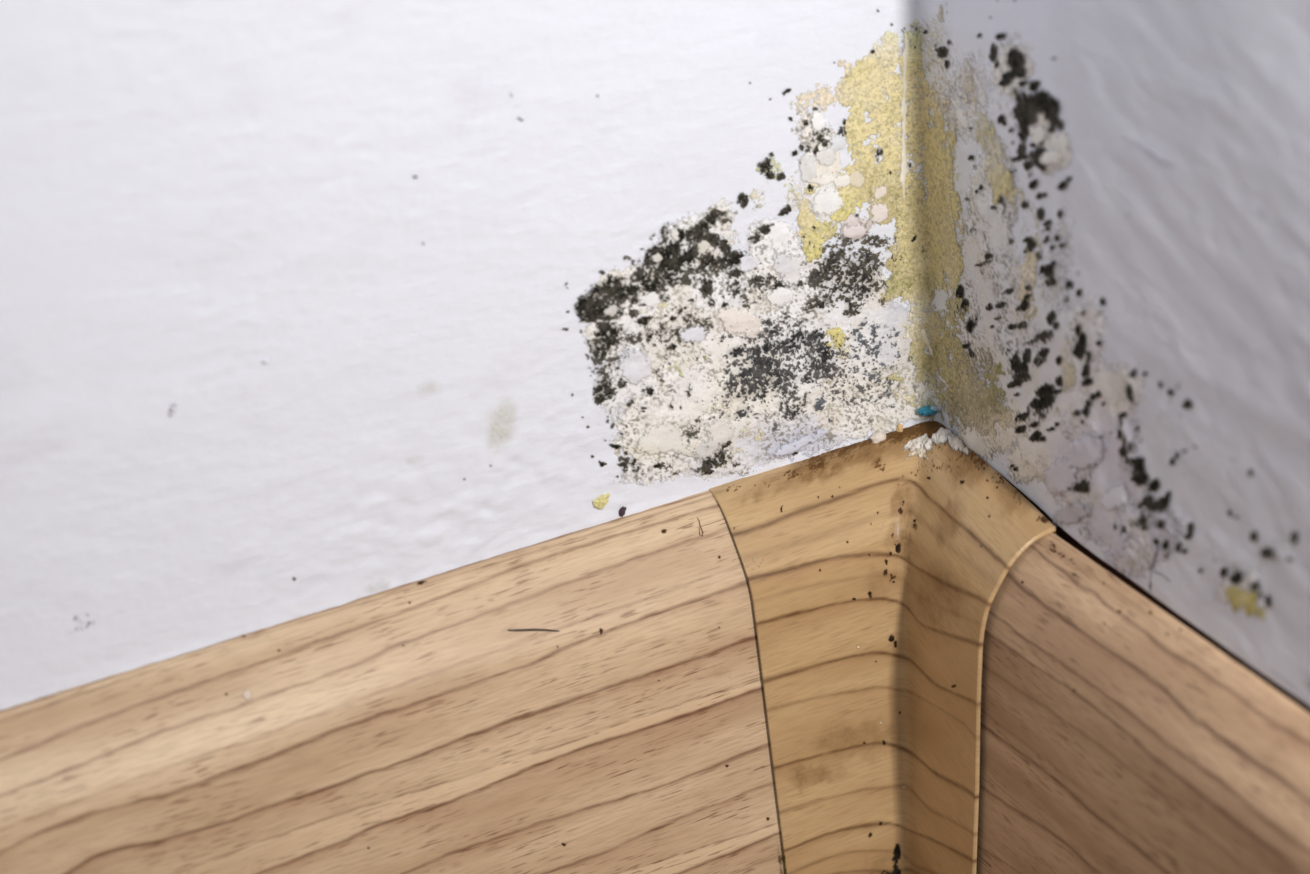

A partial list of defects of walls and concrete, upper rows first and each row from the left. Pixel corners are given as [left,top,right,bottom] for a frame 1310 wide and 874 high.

damp [562,5,1194,579]
peeling [917,405,940,416]
damp [1198,526,1299,620]